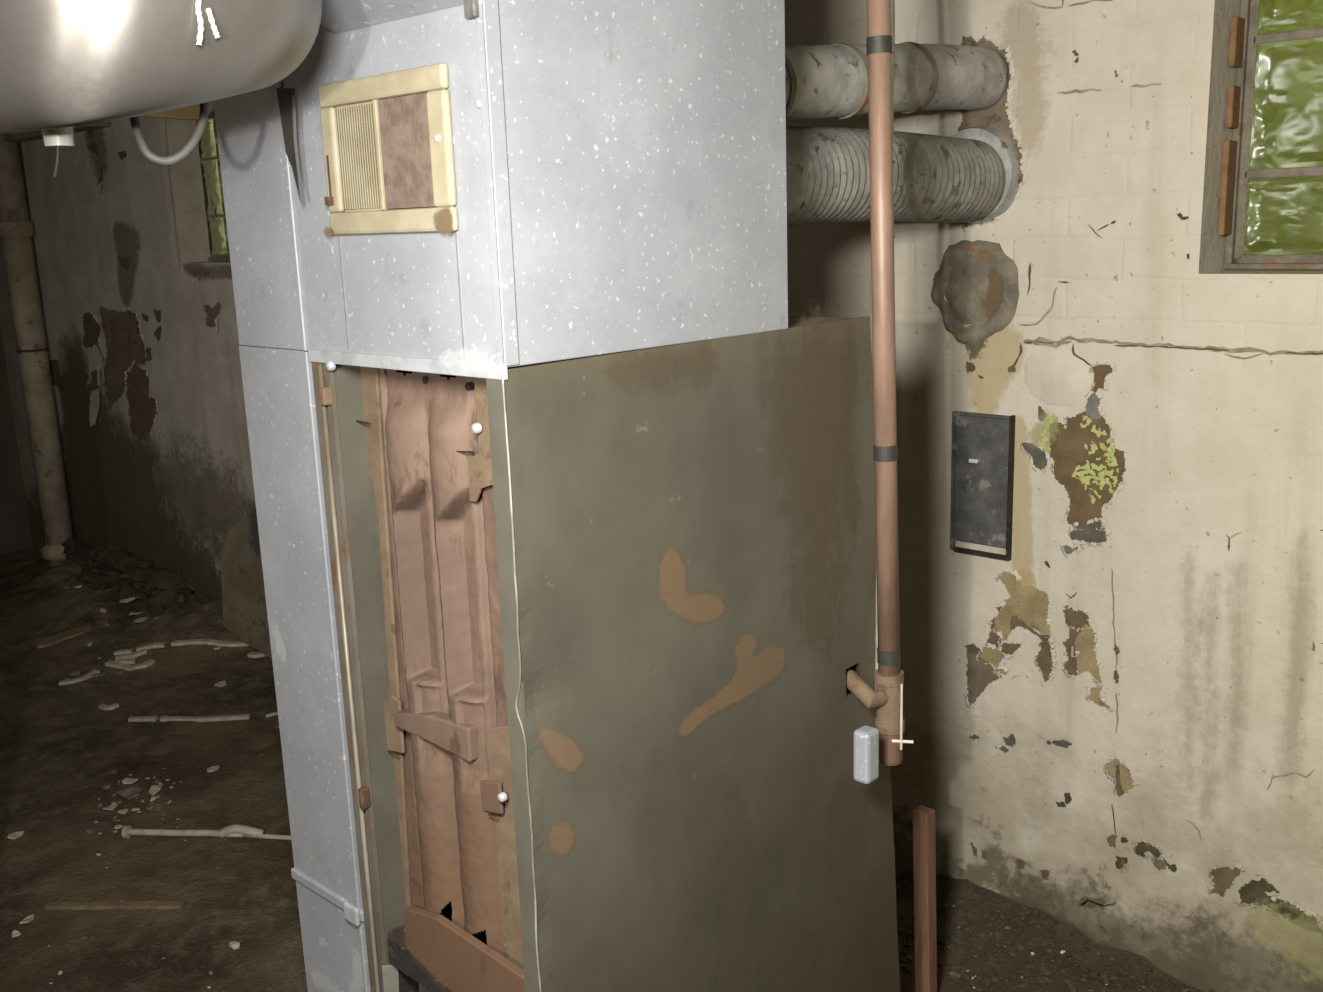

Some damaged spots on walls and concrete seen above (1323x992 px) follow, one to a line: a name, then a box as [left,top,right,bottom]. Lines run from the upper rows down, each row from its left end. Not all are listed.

peeling [203,302,236,334]
crack [1011,262,1323,370]
peeling [82,306,161,440]
damp [60,337,218,598]
peeling [1018,360,1127,559]
damp [249,505,261,557]
peeling [962,569,1114,712]
flaking render [1102,755,1139,797]
flaking render [1107,834,1177,872]
damp [1080,897,1106,908]
peeling [1206,863,1323,939]